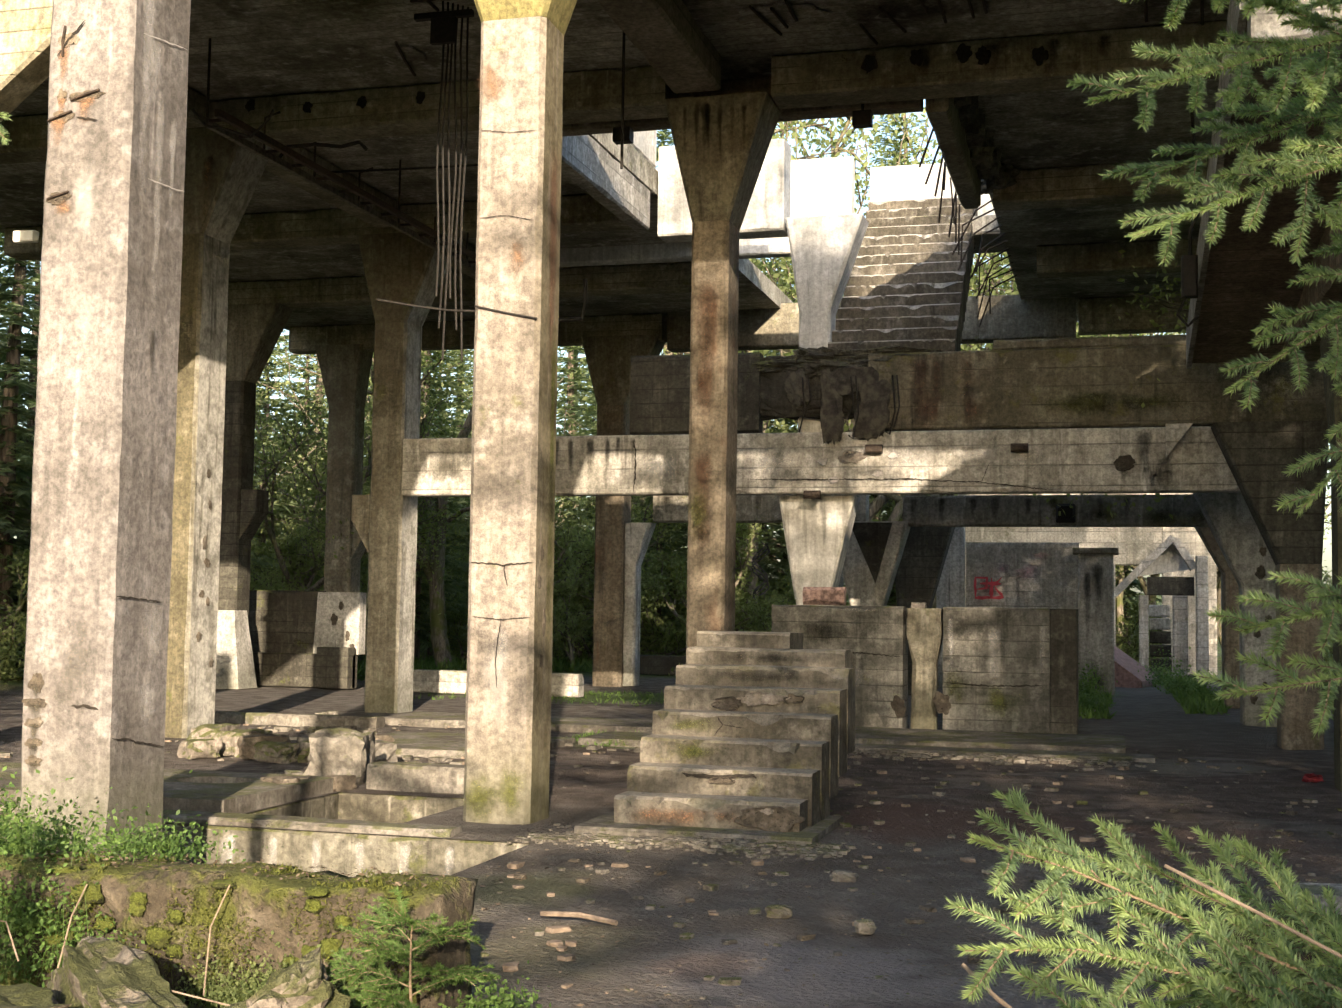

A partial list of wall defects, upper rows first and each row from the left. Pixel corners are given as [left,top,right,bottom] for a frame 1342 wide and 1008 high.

spalling [956,43,991,65]
damp [684,105,746,138]
crack [471,562,532,585]
crack [473,616,530,687]
spalling [711,692,805,711]
spalling [733,806,806,832]